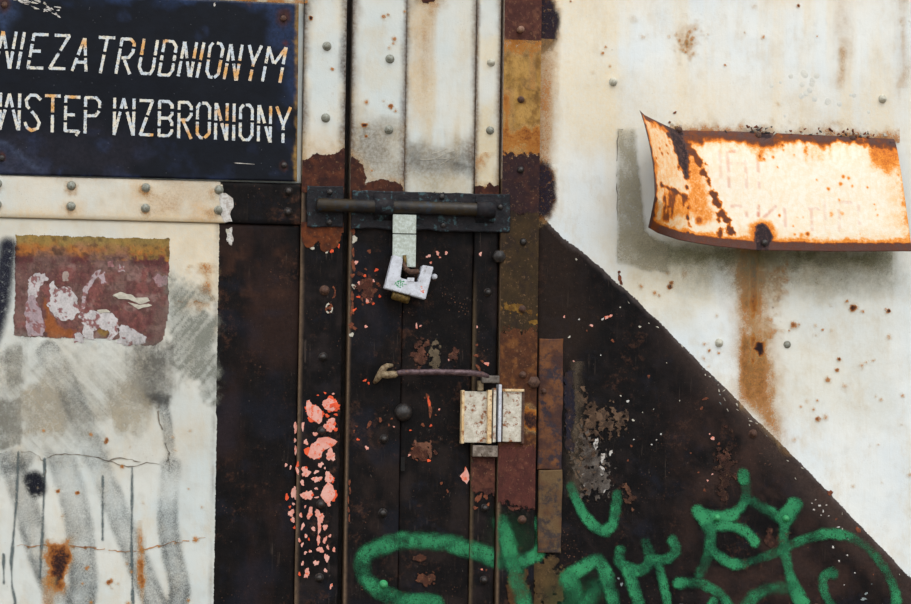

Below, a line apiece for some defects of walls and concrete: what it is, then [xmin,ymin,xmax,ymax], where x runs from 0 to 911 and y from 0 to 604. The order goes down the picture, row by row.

rust [302,148,403,199]
rust [685,125,900,143]
peeling [13,234,170,346]
rust [471,0,560,512]
rust [735,249,789,432]
peeling [285,392,340,578]
peeling [564,386,654,507]
rust [18,537,205,592]